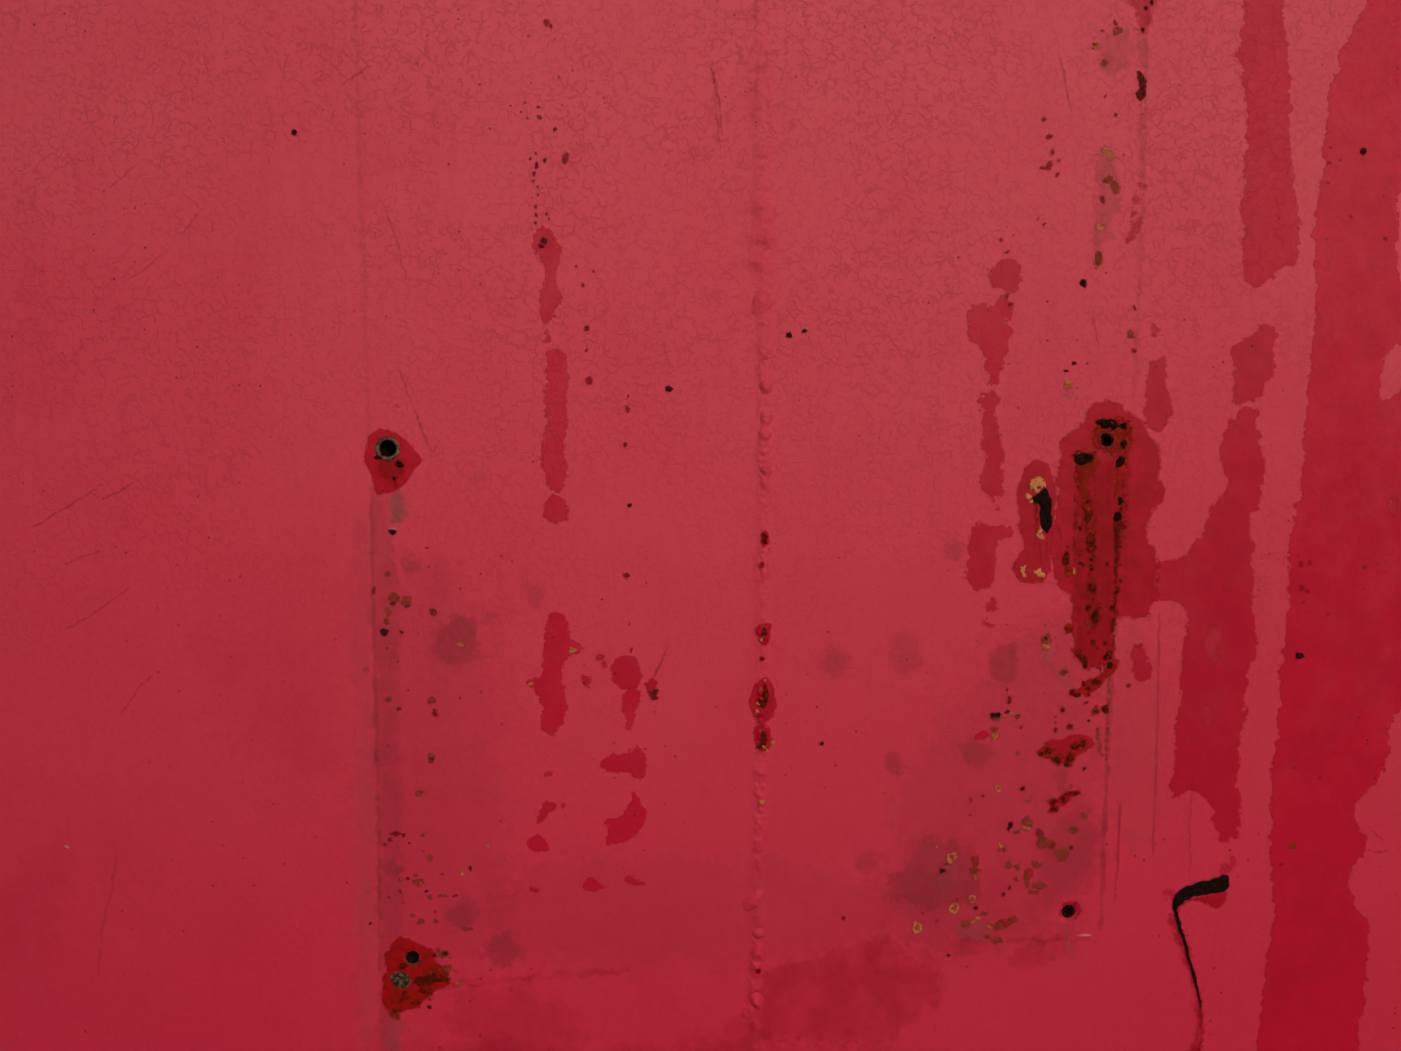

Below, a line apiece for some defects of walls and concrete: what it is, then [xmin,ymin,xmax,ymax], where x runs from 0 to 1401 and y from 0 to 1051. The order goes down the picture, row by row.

rust [1092,20,1123,67]
rust [1100,146,1120,204]
rust [1038,400,1165,770]
peeling [645,679,659,700]
rust [975,688,1022,740]
rust [998,786,1087,896]
rust [388,875,457,924]
rust [912,868,1018,944]
rust [382,937,463,1020]